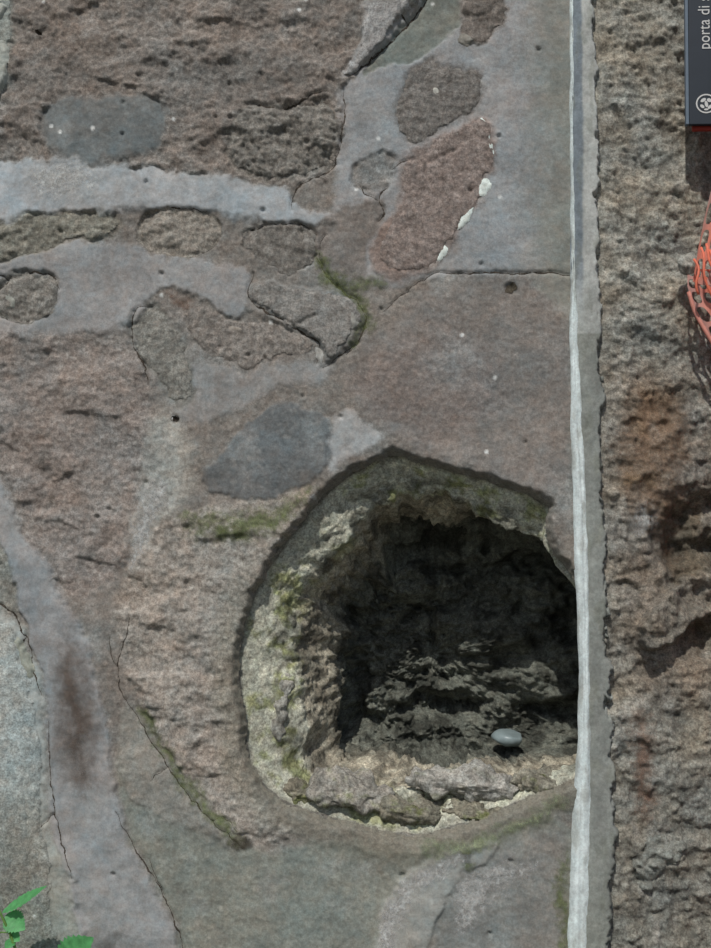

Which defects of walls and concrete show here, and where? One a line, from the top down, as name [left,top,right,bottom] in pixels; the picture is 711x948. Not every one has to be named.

crack [115,811,183,948]